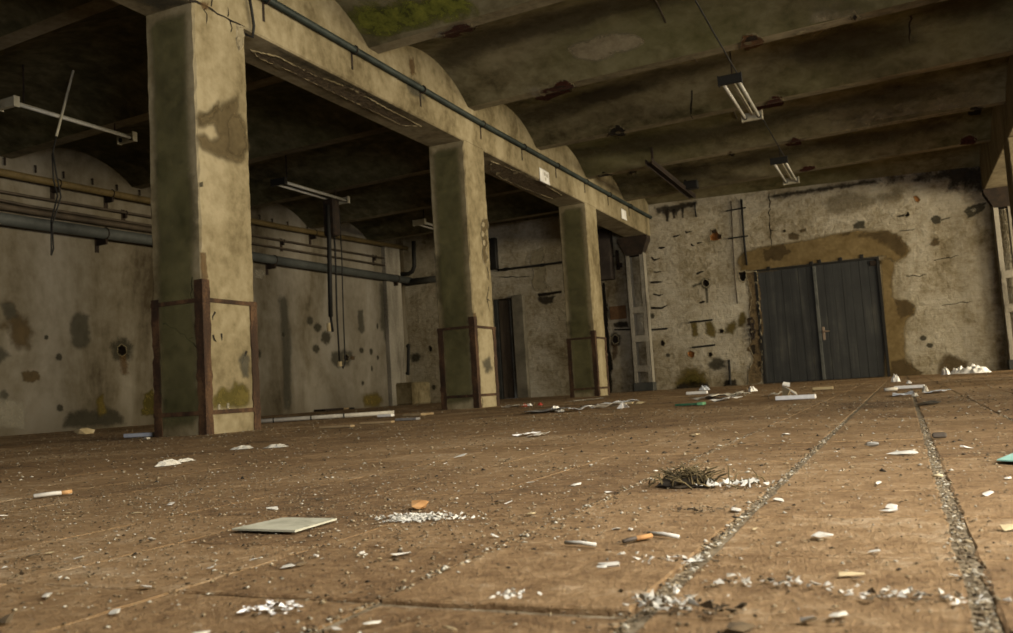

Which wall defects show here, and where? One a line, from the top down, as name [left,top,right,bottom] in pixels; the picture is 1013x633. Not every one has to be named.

crack [190,0,245,31]
flaking render [534,80,575,101]
damp [771,180,876,198]
damp [141,0,248,425]
damp [888,166,1003,318]
damp [737,221,922,377]
damp [2,303,32,347]
damp [71,314,90,347]
damp [22,371,40,382]
damp [213,350,261,410]